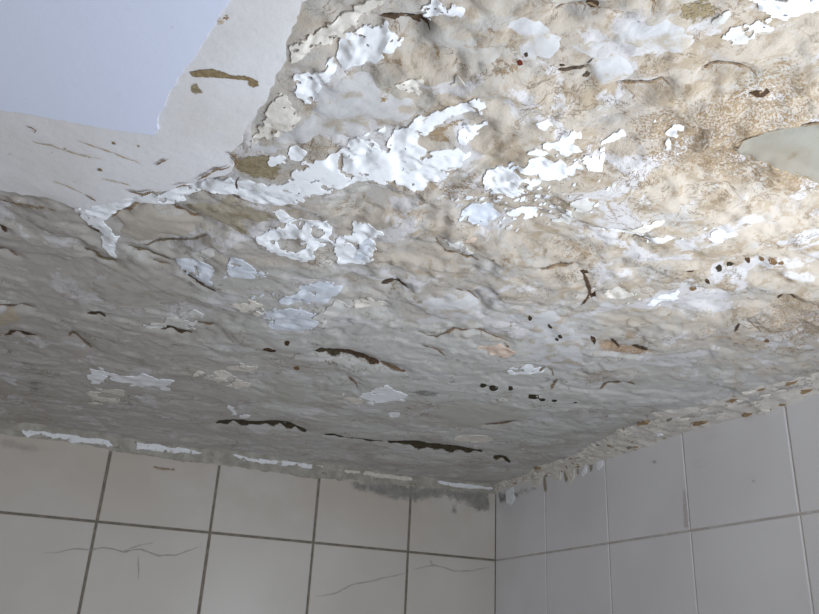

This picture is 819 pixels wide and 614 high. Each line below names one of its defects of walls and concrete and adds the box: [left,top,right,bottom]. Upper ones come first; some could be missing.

peeling [712,0,819,45]
flaking render [749,88,770,98]
peeling [0,0,488,268]
peeling [665,121,686,161]
peeling [451,129,626,232]
peeling [231,281,386,331]
peeling [604,283,679,306]
peeling [86,367,175,405]
flaking render [22,430,113,447]
flaking render [136,442,201,454]
flaking render [437,372,819,505]
crack [45,543,197,579]